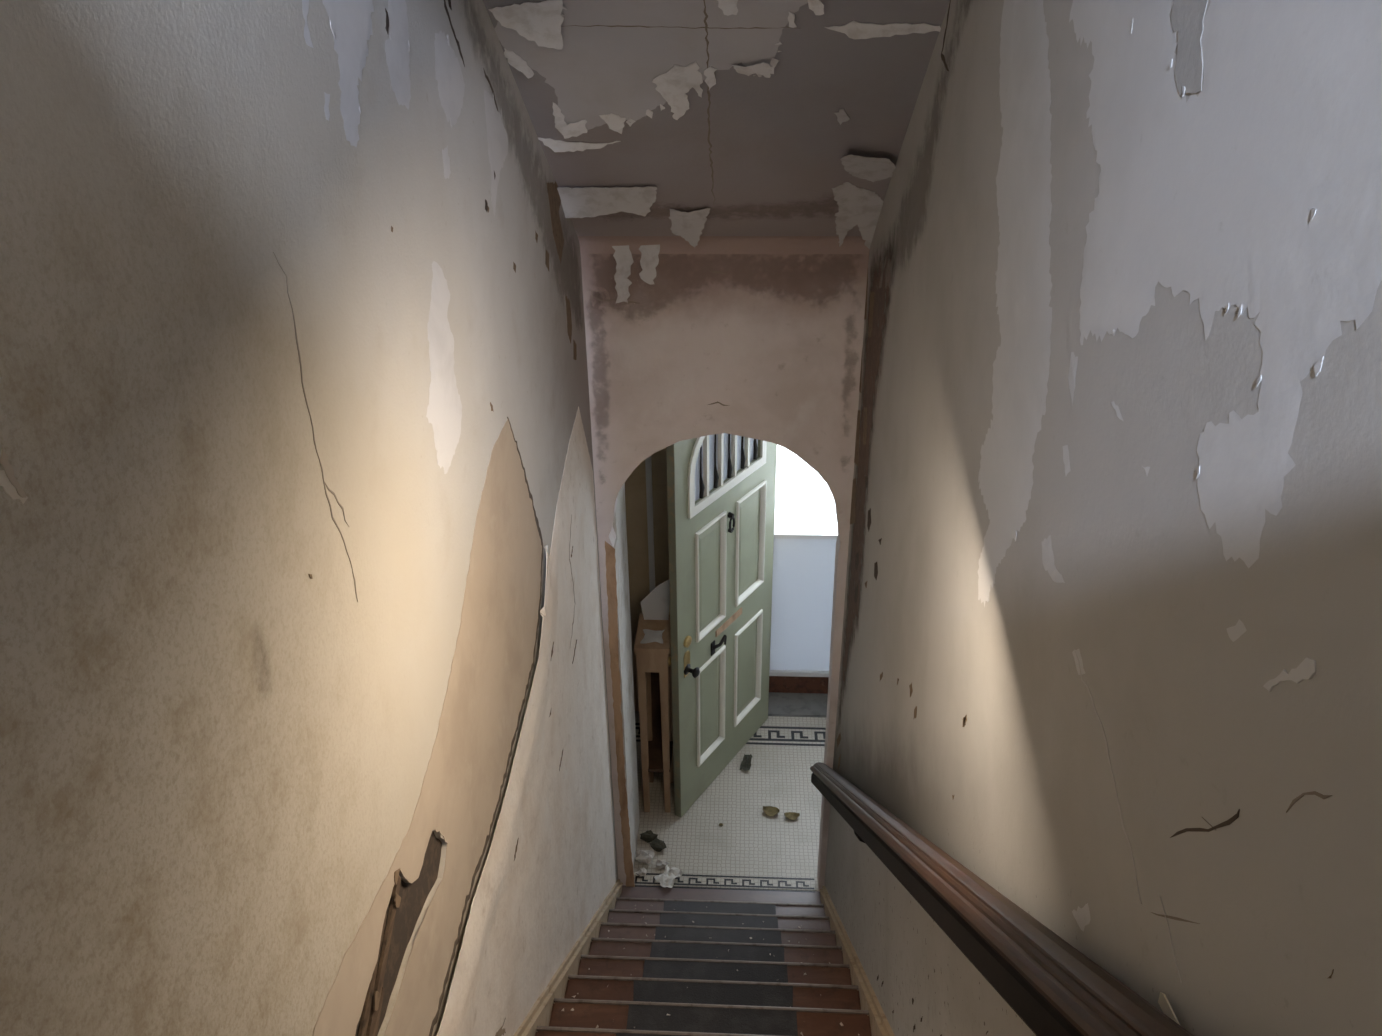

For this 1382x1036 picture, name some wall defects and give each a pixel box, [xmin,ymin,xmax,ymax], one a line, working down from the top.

peeling [302,0,411,147]
peeling [494,0,808,152]
peeling [825,20,941,39]
peeling [484,90,509,217]
spalling [535,181,564,271]
peeling [565,296,577,360]
peeling [978,0,1052,607]
peeling [1068,0,1382,568]
crack [273,252,358,602]
spalling [312,402,542,1036]
crack [1170,809,1240,838]
crack [1286,791,1332,813]